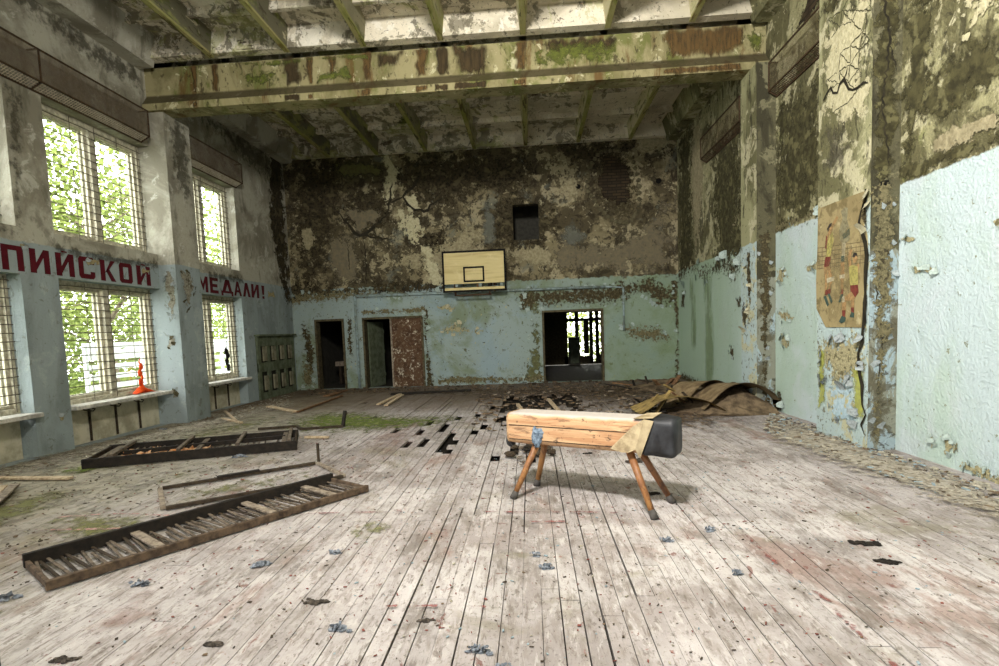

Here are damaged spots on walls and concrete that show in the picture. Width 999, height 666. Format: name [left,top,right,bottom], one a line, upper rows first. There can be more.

corrosion [282,57,313,101]
damp [201,117,560,310]
corrosion [361,51,403,96]
corrosion [416,44,487,92]
peeling [292,111,818,411]
corrosion [514,36,617,84]
damp [775,75,849,233]
crack [823,0,897,166]
spalling [816,177,916,446]
crack [857,189,883,435]
peeling [911,264,939,274]
damp [872,0,999,182]